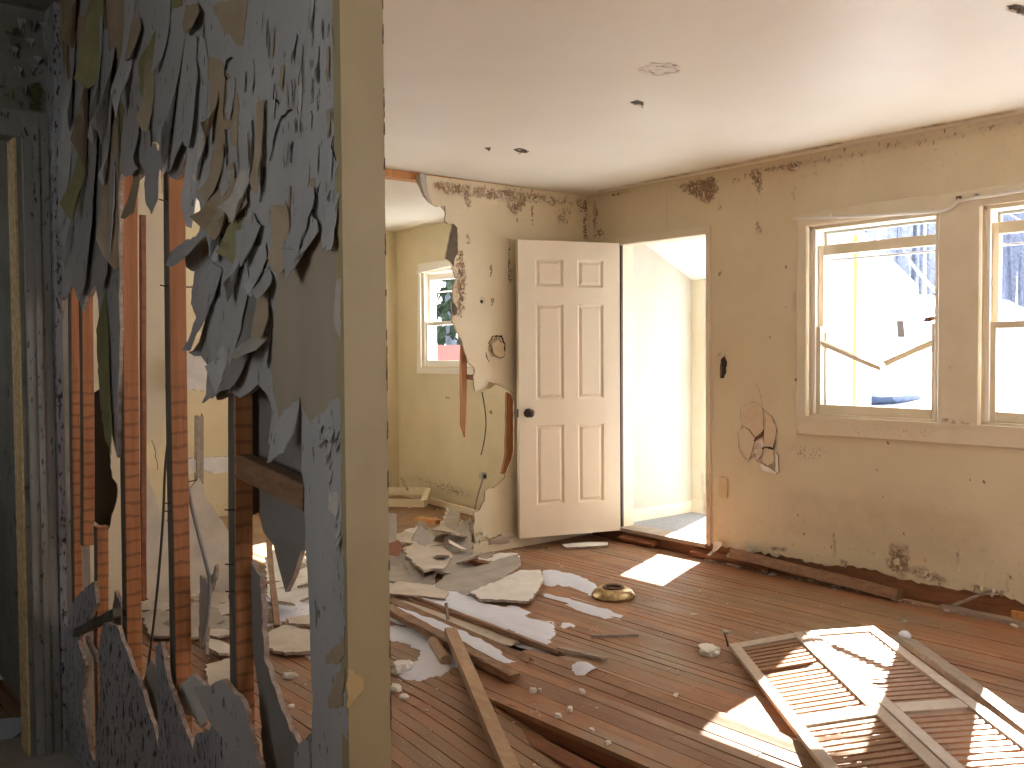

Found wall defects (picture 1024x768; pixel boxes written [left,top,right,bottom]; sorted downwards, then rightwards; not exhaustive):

peeling [434,182,585,223]
peeling [454,234,471,317]
peeling [56,0,345,640]
spalling [486,335,506,362]
spalling [718,351,729,378]